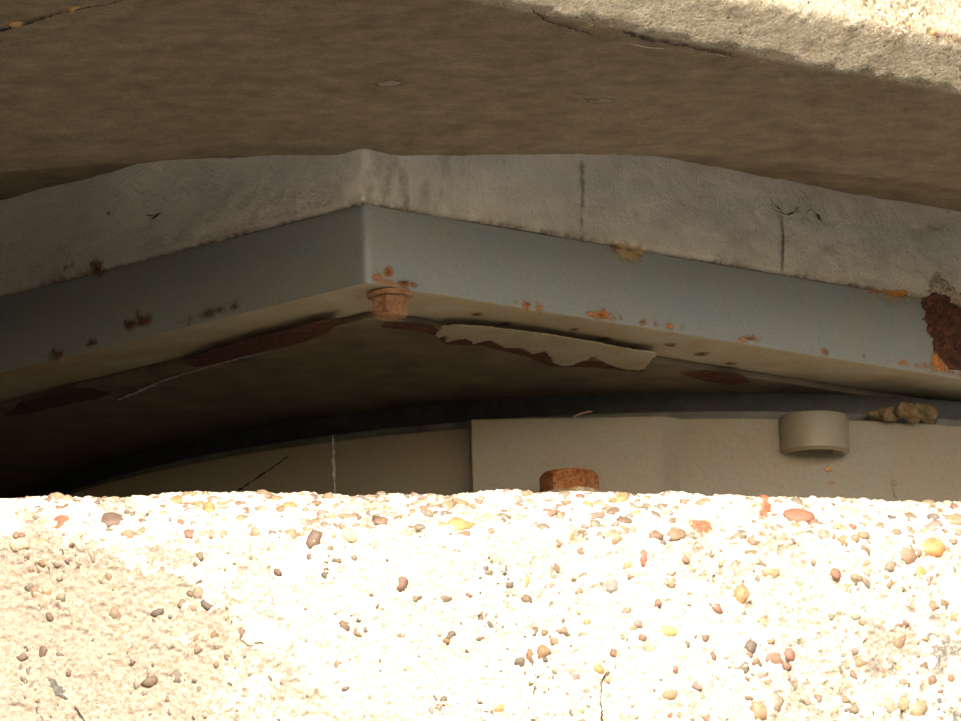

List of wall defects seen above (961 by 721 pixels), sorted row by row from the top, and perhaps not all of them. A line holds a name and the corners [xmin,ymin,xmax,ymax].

rust [373,268,416,287]
rust [900,292,961,373]